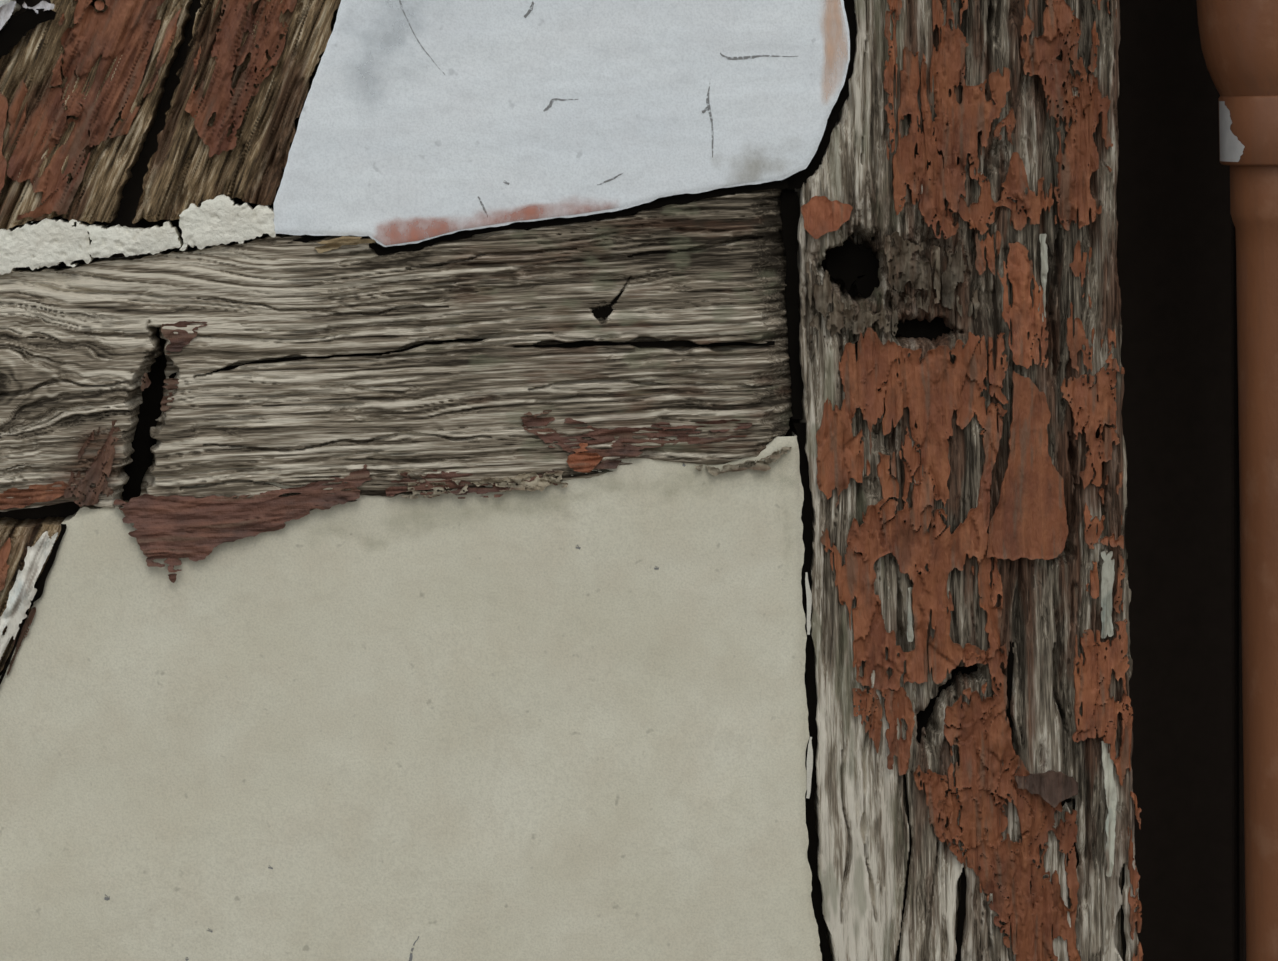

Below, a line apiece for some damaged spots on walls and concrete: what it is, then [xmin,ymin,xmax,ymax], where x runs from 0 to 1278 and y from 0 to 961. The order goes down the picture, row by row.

peeling [0,0,181,220]
peeling [185,0,297,158]
peeling [0,420,372,583]
crack [122,0,880,961]
peeling [385,410,752,499]
peeling [816,0,1144,961]
peeling [0,531,58,676]
crack [916,642,1017,755]
crack [896,774,912,961]
crack [955,853,967,961]
crack [1061,797,1079,869]
crack [1119,864,1127,961]